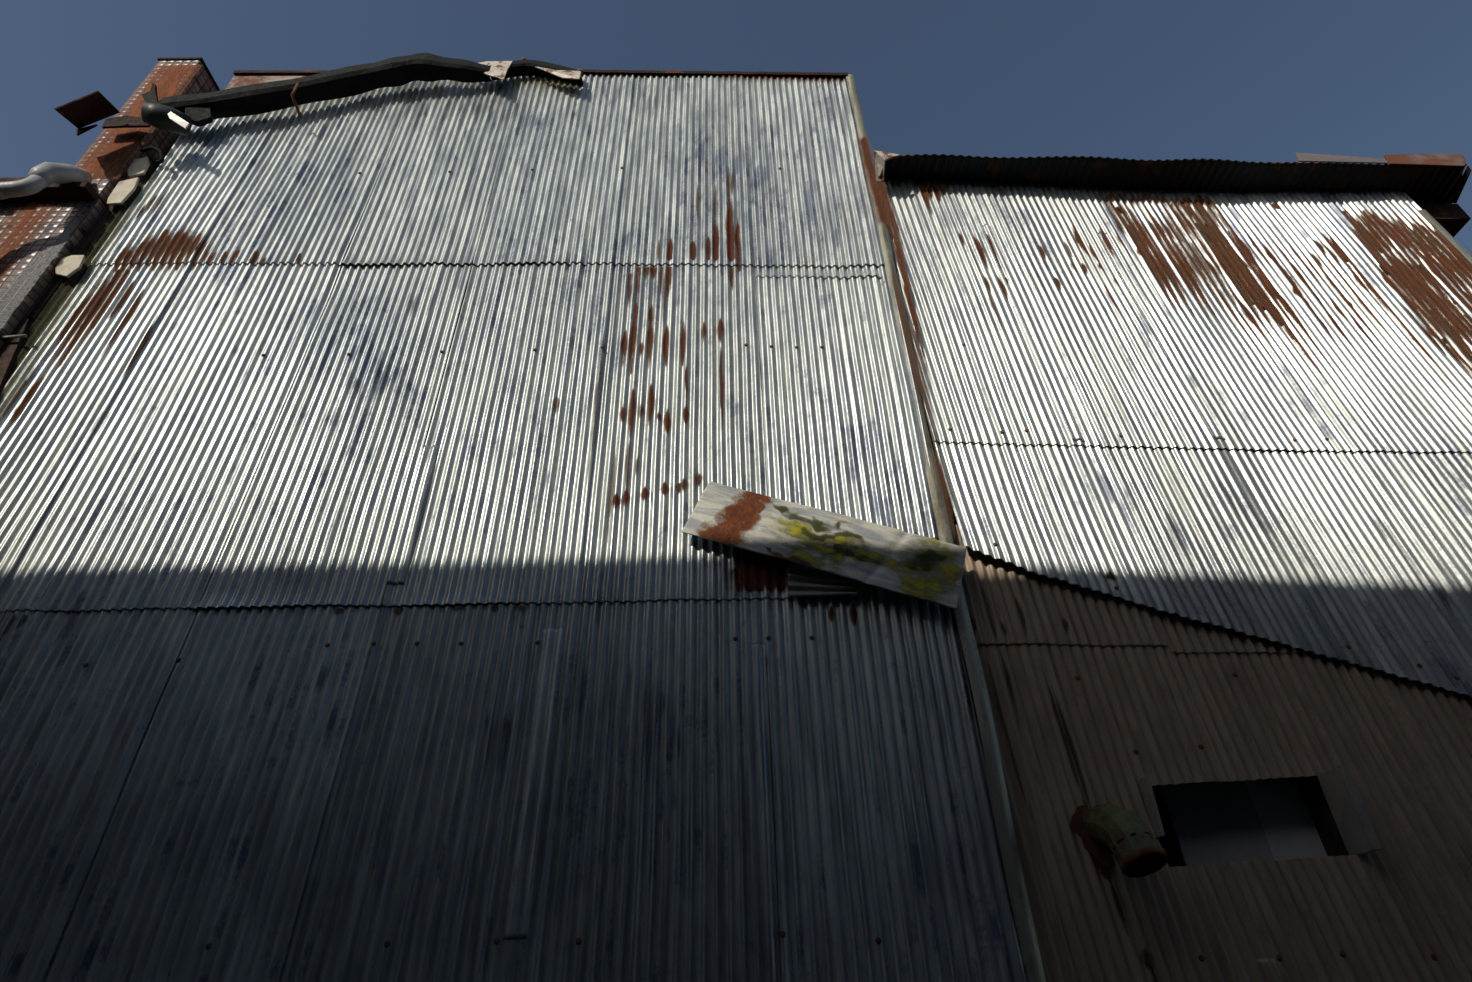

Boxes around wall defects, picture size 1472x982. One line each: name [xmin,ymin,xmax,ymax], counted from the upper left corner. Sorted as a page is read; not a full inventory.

rust [0,191,266,422]
rust [587,331,604,487]
rust [607,173,741,543]
rust [959,234,1009,328]
rust [1064,192,1472,374]
rust [699,491,813,591]